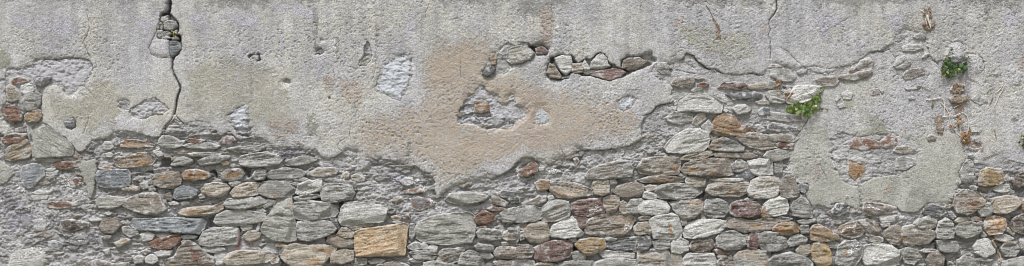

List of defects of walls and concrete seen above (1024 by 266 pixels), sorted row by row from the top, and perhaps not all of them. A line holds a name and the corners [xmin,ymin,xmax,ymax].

spalling [14,59,91,93]
crack [148,28,184,134]
spalling [377,56,410,98]
crack [748,0,831,143]
spalling [119,99,164,117]
spalling [230,107,249,134]
spalling [461,89,522,126]
spalling [836,140,871,182]